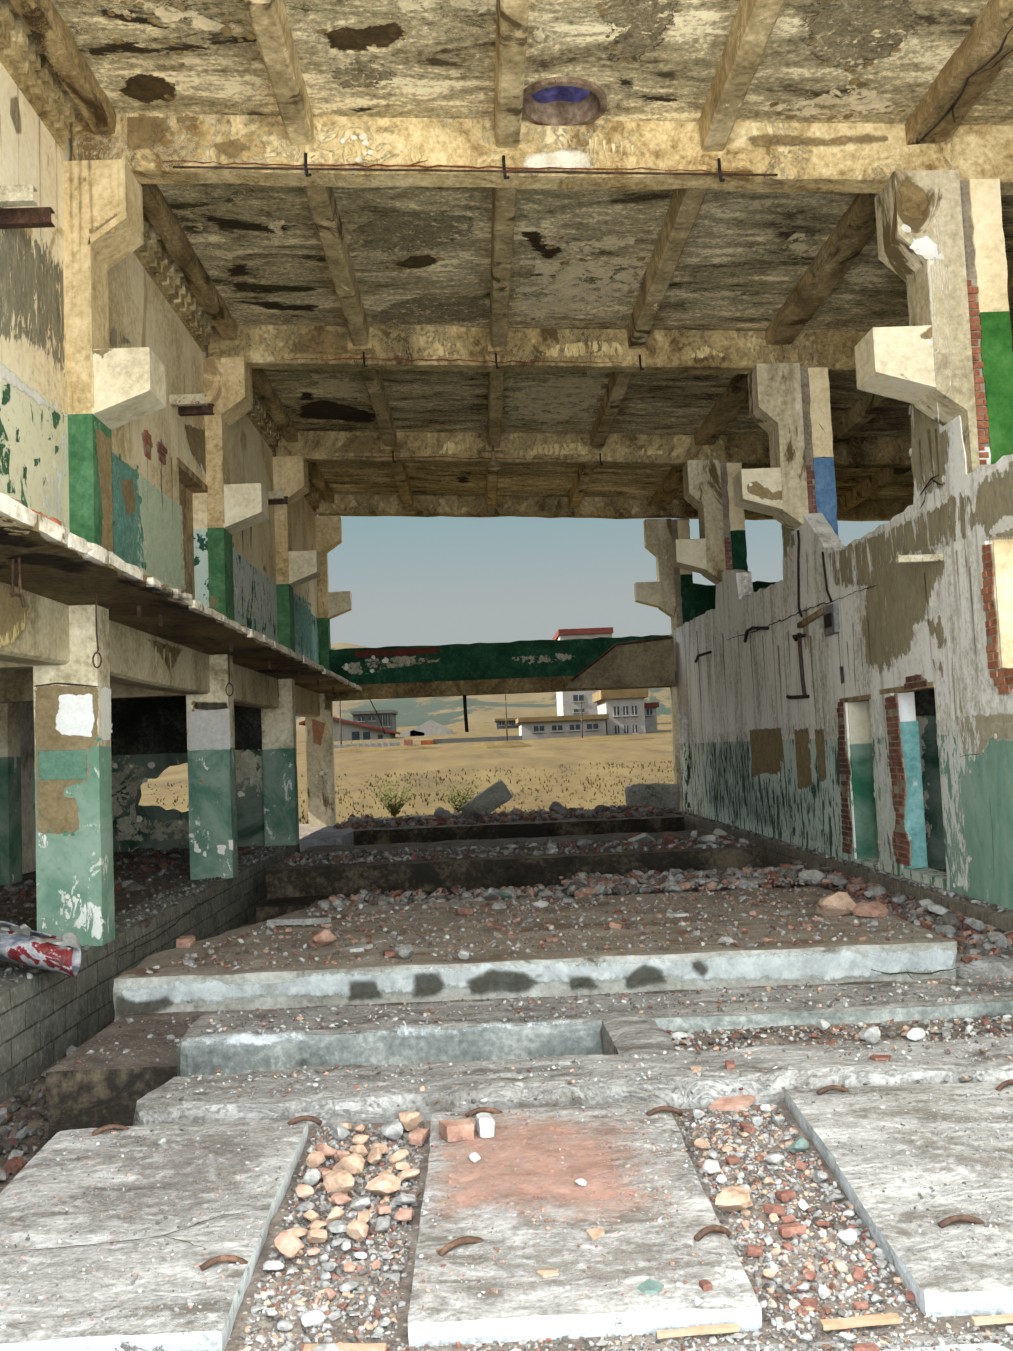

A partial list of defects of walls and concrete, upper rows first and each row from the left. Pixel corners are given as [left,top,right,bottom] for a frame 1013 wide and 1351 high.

peeling [89,0,257,104]
spalling [316,0,490,52]
water stain [0,228,65,377]
spalling [0,514,30,535]
peeling [0,363,68,526]
spalling [745,479,783,503]
spalling [781,525,796,558]
spalling [828,404,1013,892]
peeling [34,685,112,849]
spalling [708,702,853,854]
peeling [41,894,104,940]